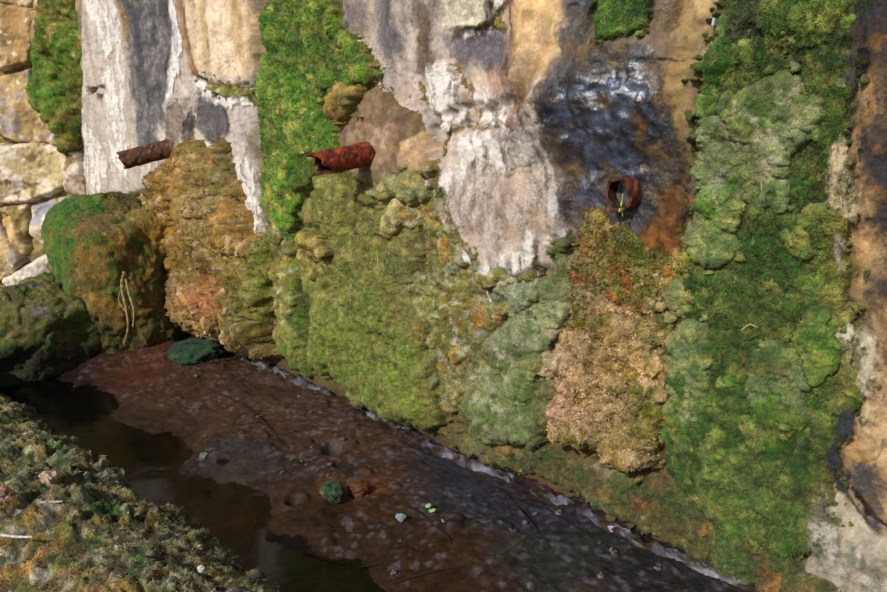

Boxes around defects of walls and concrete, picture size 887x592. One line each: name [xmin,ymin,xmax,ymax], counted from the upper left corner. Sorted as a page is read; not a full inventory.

water stain [374,0,690,278]